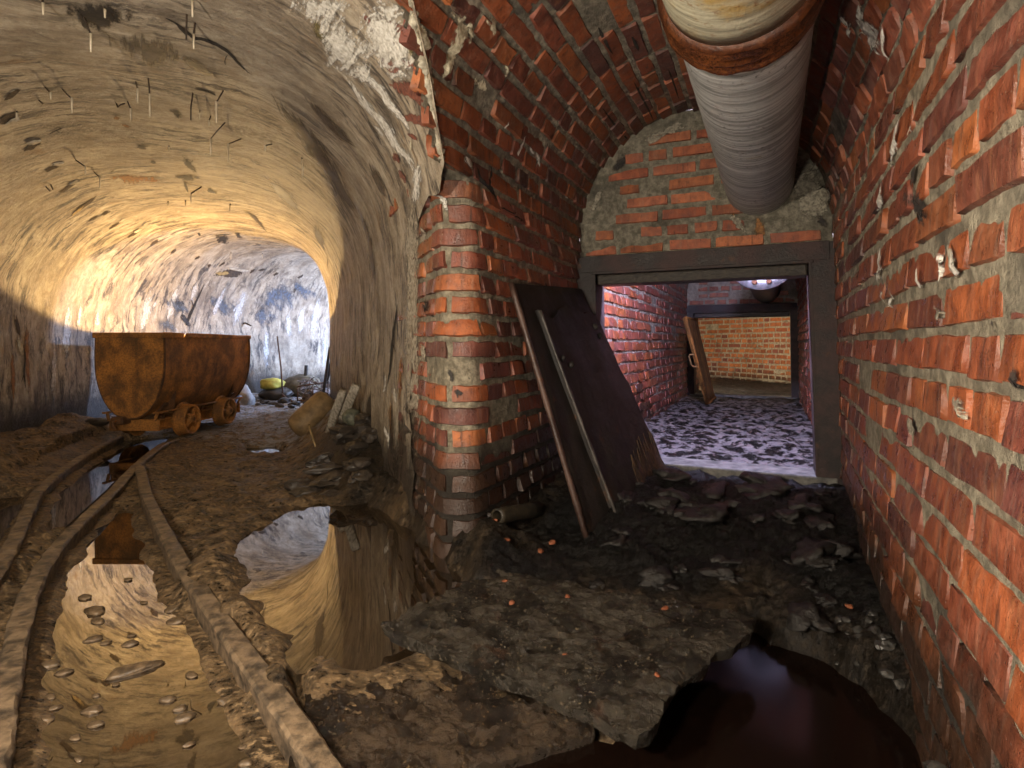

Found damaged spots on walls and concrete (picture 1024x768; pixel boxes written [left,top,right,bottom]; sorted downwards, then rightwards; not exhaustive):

crack [166,18,249,73]
flaking render [380,58,425,140]